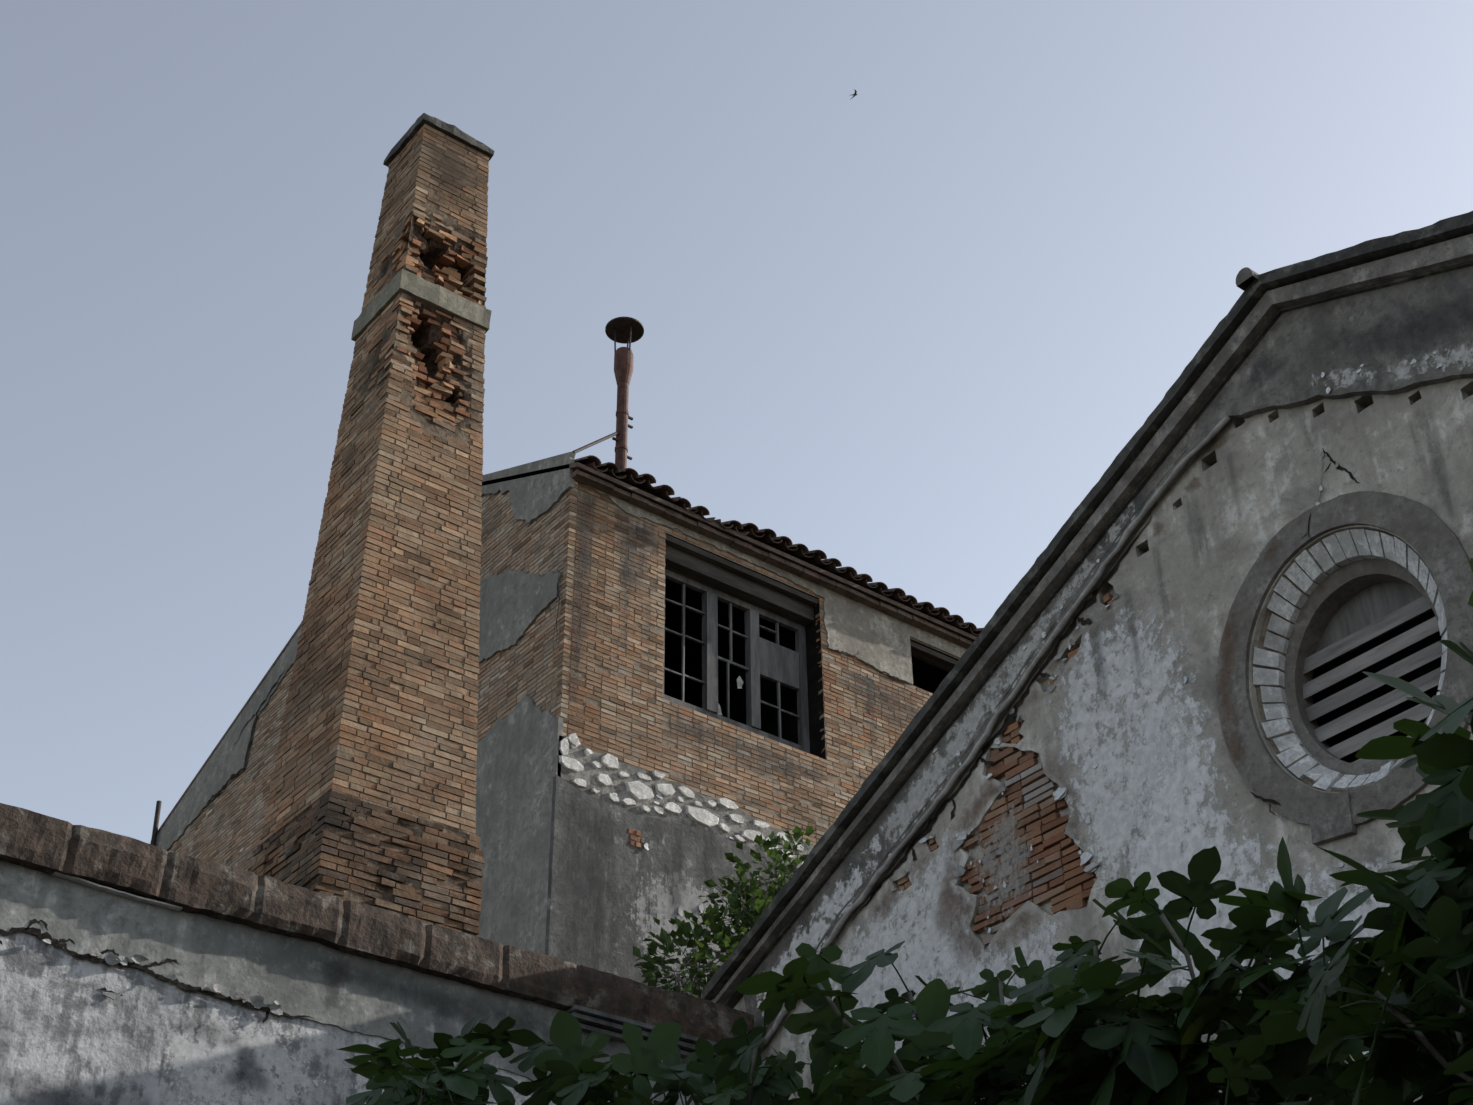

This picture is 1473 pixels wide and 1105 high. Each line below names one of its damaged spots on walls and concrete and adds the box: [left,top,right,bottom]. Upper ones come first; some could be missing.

peeling [1312,344,1473,394]
crack [1301,448,1359,539]
peeling [764,502,1413,1022]
crack [0,918,314,1023]